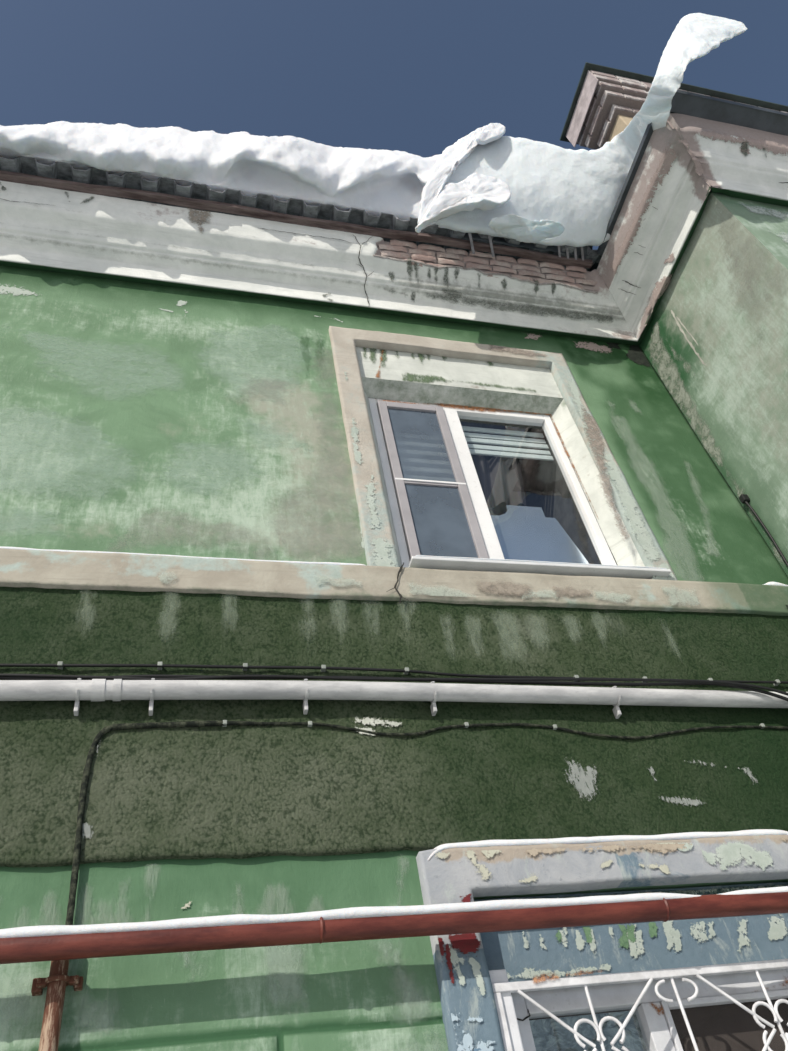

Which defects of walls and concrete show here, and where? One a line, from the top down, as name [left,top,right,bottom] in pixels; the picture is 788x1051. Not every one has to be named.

crack [260,228,374,303]
flaking render [373,239,598,294]
peeling [0,284,40,296]
crack [388,562,410,604]
peeling [578,841,773,874]
peeling [636,885,783,895]
peeling [507,926,611,979]
peeling [609,920,716,959]
peeling [737,919,751,952]
peeling [768,915,788,941]
peeling [451,1012,495,1051]